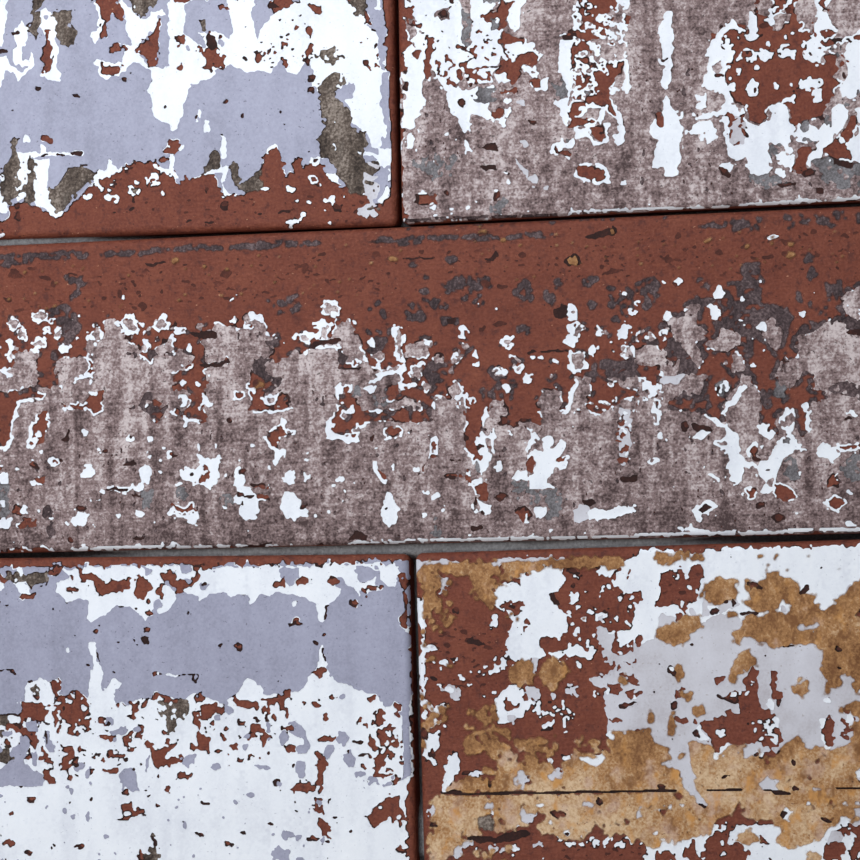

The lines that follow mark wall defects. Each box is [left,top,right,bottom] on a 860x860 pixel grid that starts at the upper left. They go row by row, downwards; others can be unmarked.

peeling [0,0,860,239]
peeling [0,285,860,860]
crack [440,788,677,796]
crack [707,787,791,795]